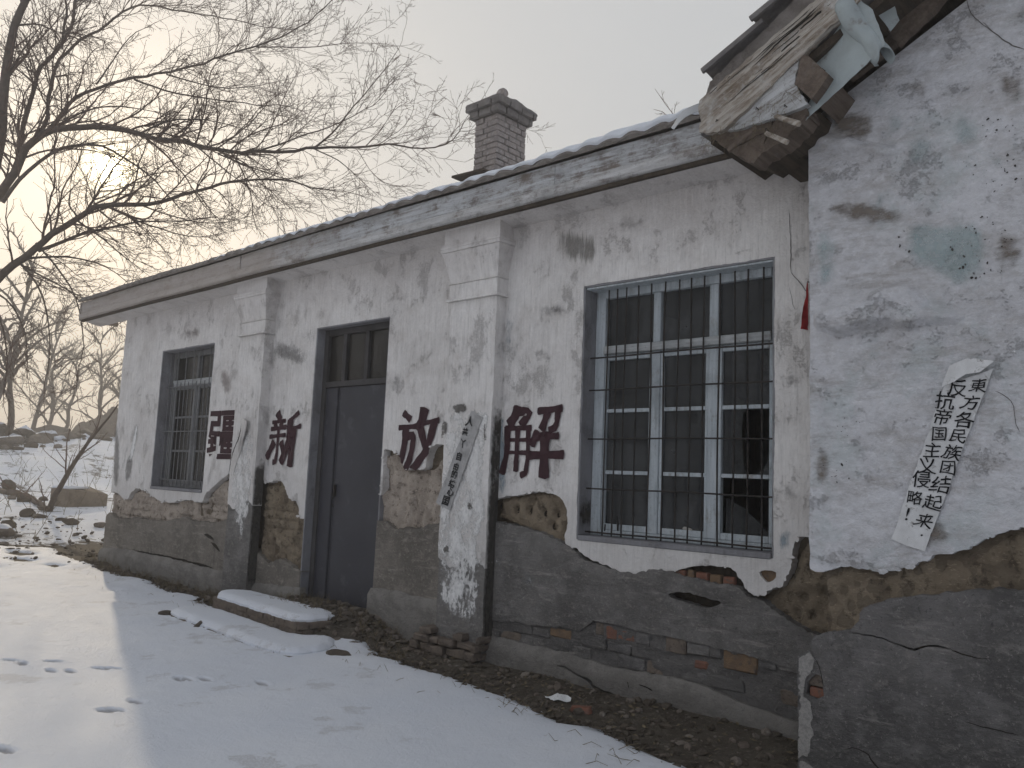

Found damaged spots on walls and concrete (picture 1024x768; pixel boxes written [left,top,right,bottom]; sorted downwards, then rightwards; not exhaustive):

crack [789,214,806,304]
leakage [833,204,894,222]
flaking render [112,418,253,534]
flaking render [261,480,304,569]
peeling [379,404,488,618]
flaking render [499,420,568,541]
flaking render [674,533,1024,633]
crack [911,645,989,659]